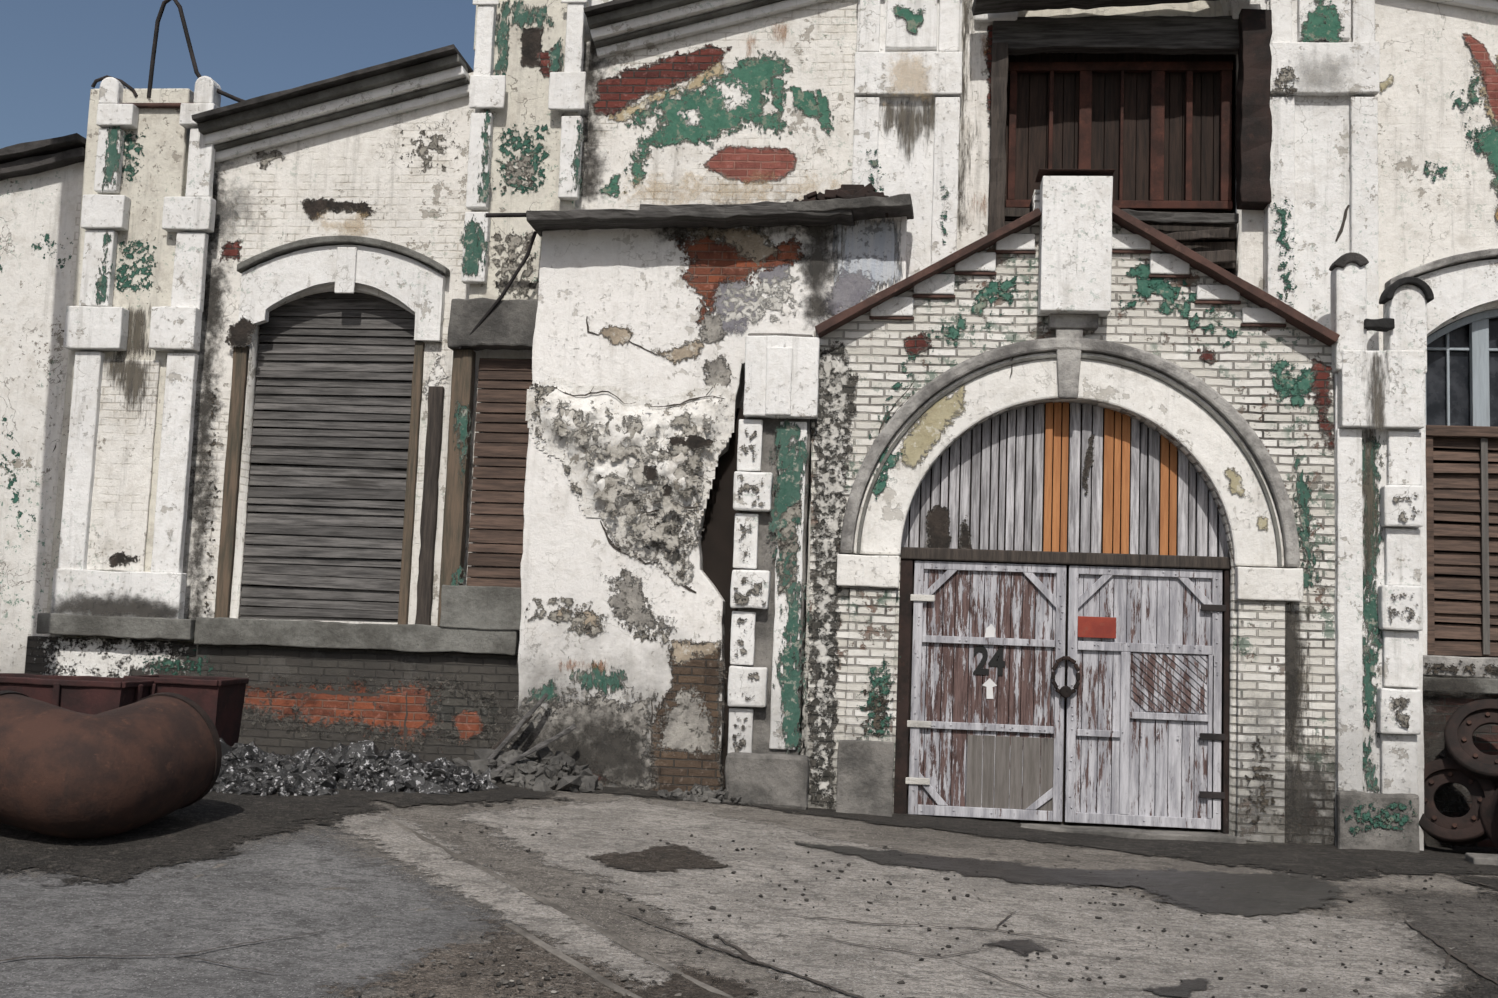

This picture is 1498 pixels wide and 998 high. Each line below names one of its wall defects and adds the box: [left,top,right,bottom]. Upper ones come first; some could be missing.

peeling [256,150,285,170]
peeling [400,109,535,204]
peeling [594,172,621,198]
flaking render [592,43,753,117]
peeling [677,106,704,128]
flaking render [703,144,797,185]
peeling [768,76,835,136]
water stain [884,98,935,158]
flaking render [1462,33,1498,123]
water stain [107,308,151,411]
flaking render [241,227,858,808]
flaking render [856,682,896,739]